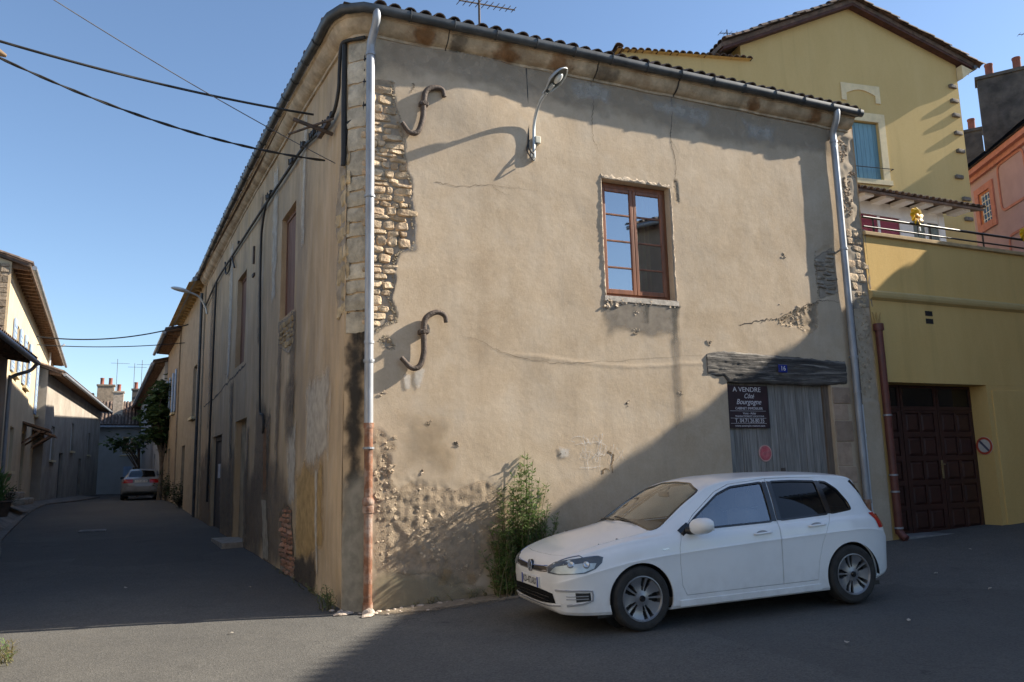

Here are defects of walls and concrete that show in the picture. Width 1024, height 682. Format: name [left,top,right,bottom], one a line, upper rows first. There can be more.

flaking render [335,80,418,351]
crack [670,80,680,204]
flaking render [777,139,873,397]
damp [345,331,365,484]
flaking render [278,501,295,578]
peeling [374,429,511,587]